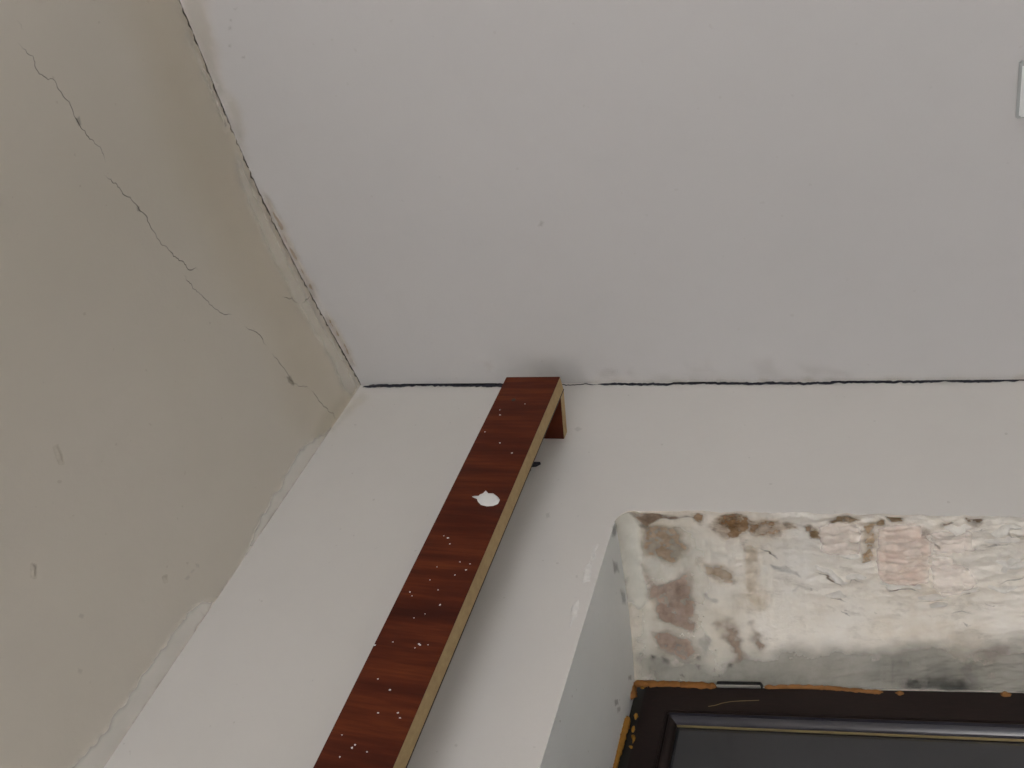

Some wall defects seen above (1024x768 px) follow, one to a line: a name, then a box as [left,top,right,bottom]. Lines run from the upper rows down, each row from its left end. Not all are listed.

crack [27,53,92,140]
crack [562,378,1024,386]
spalling [633,513,702,563]
spalling [714,514,821,539]
spalling [829,516,858,524]
spalling [706,567,732,582]
spalling [650,575,694,659]
spalling [726,627,742,661]
water stain [650,648,1024,693]